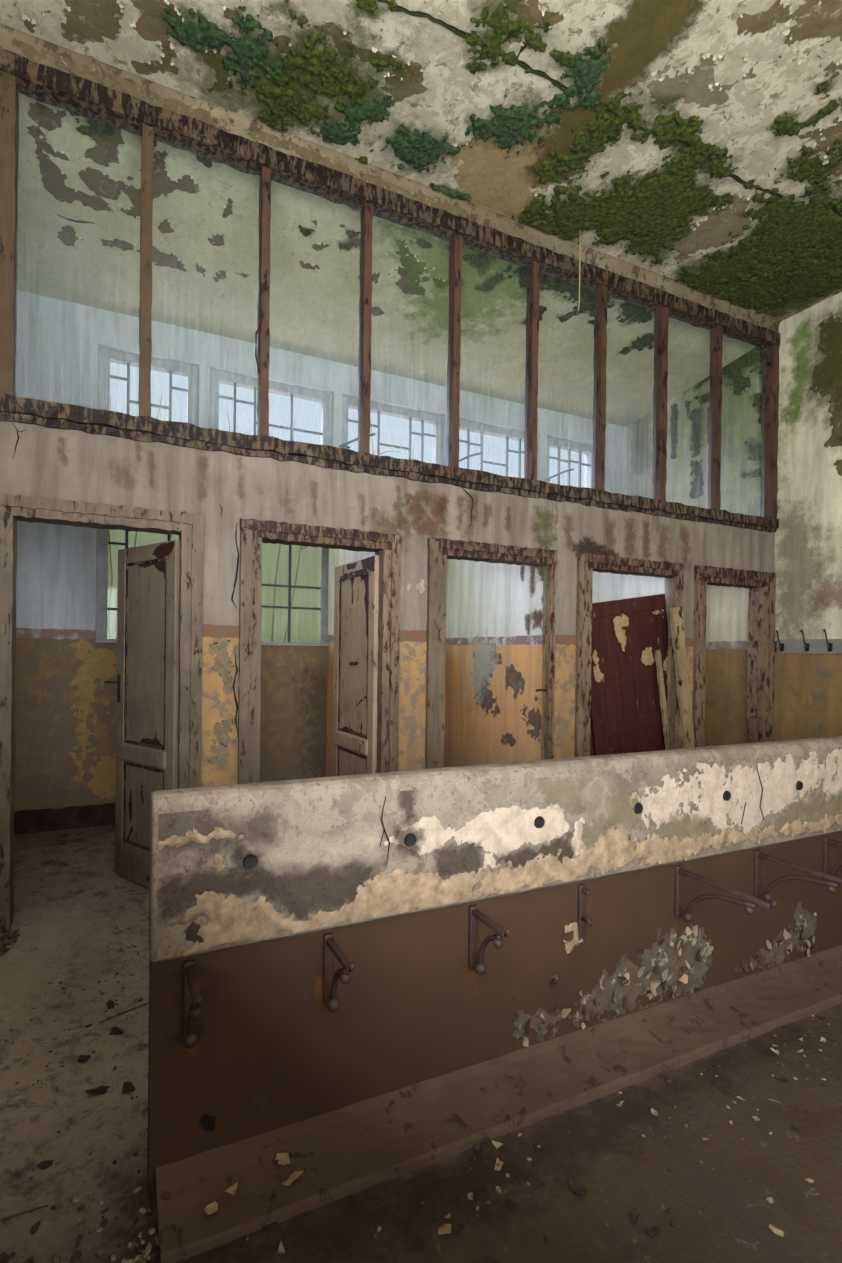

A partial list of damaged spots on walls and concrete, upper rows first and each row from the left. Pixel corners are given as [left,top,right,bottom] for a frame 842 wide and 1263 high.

peeling [26,102,201,219]
peeling [0,0,232,132]
peeling [306,21,428,103]
peeling [247,123,552,220]
crack [378,0,842,216]
damp [527,0,704,187]
peeling [647,0,842,112]
peeling [101,238,249,282]
peeling [809,313,842,476]
peeling [470,642,541,747]
peeling [156,749,842,959]
peeling [511,919,714,1047]